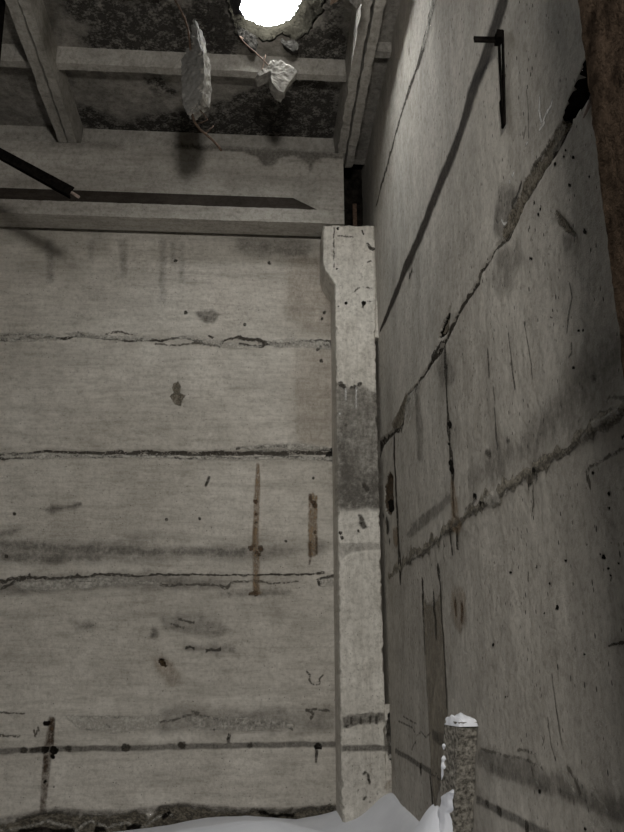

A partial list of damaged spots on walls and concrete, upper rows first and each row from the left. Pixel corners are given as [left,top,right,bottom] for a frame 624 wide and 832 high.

water stain [64,0,247,55]
spalling [227,0,324,41]
water stain [295,0,347,60]
water stain [77,78,340,138]
crack [0,331,331,351]
crack [380,120,624,585]
crack [0,443,332,461]
rust [248,465,263,597]
rust [308,494,318,563]
spalling [383,472,394,545]
crack [0,571,325,590]
rust [36,718,59,811]